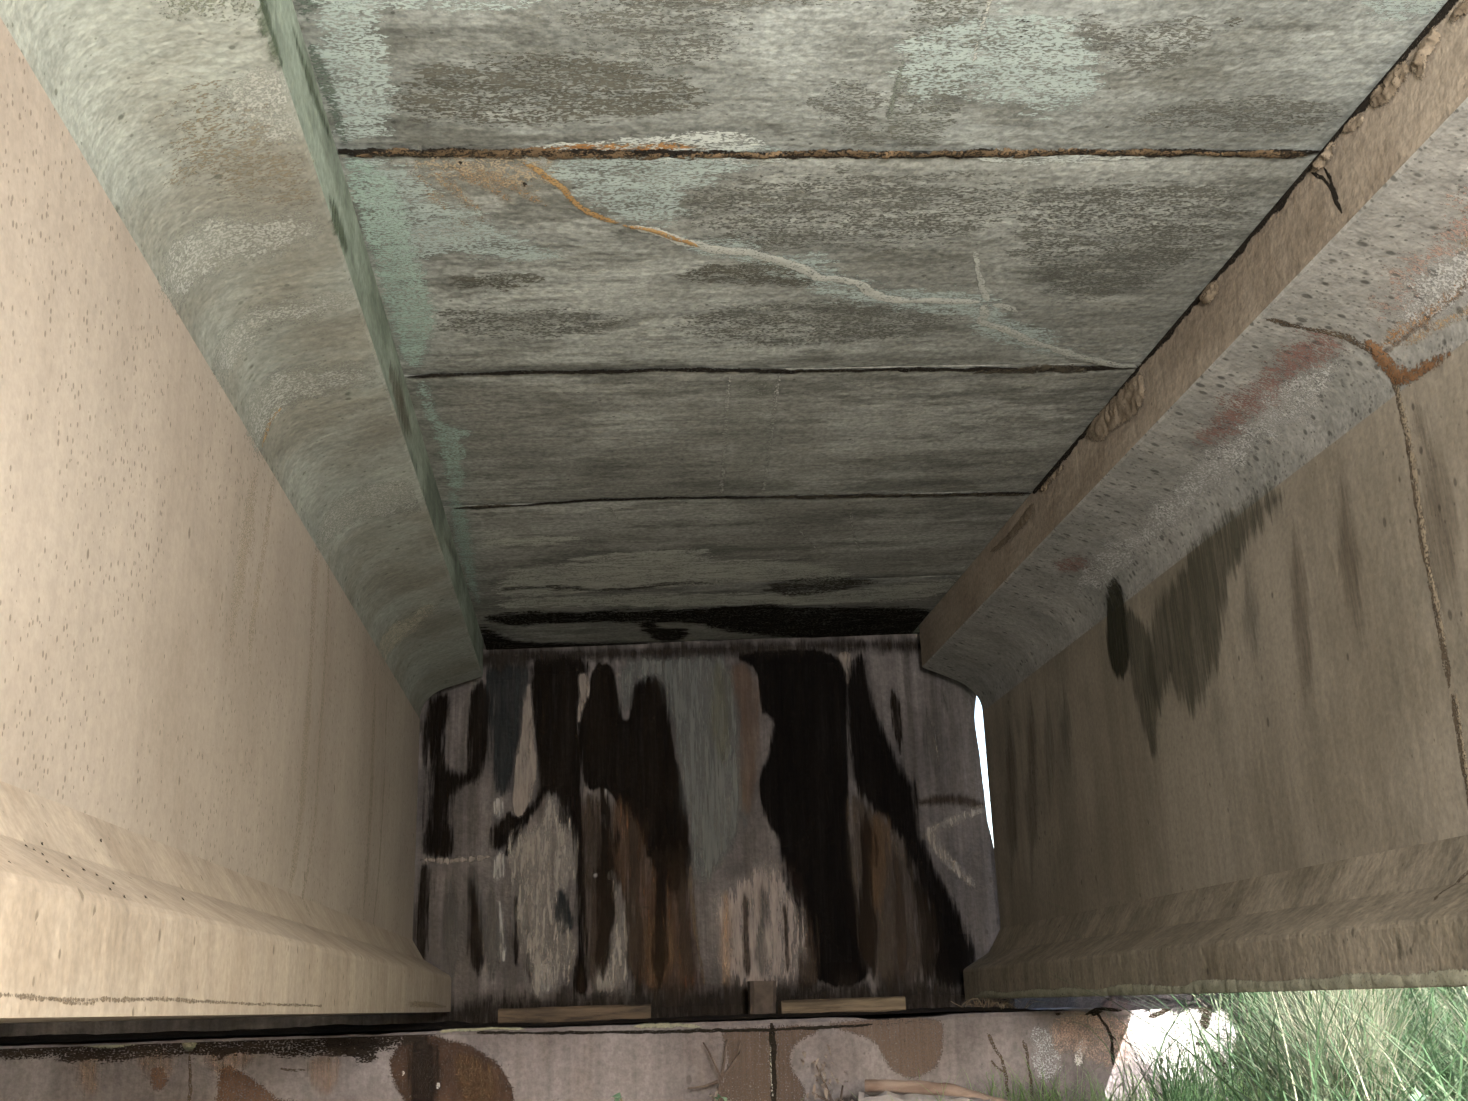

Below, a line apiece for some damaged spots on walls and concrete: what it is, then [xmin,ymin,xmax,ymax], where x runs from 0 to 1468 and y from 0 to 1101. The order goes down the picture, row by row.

rust [391,141,705,228]
damp [297,0,1260,1101]
crack [523,0,1459,494]
damp [1192,330,1350,448]